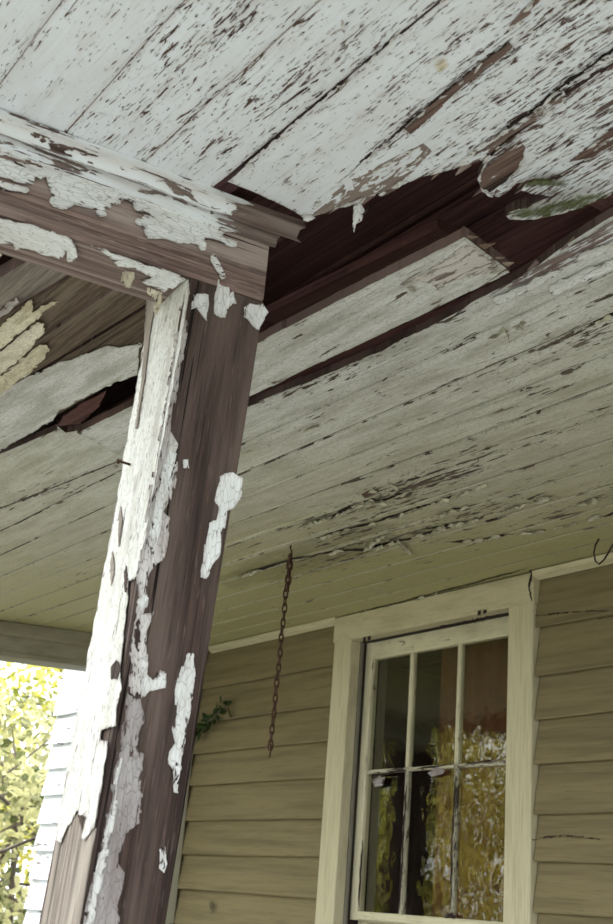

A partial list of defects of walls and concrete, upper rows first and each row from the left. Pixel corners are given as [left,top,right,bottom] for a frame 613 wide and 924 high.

peeling [402,0,540,137]
peeling [303,144,432,231]
peeling [453,91,566,198]
peeling [570,128,613,161]
peeling [400,245,503,292]
peeling [491,221,613,305]
peeling [0,148,268,924]
crack [236,482,613,579]
crack [532,833,600,841]